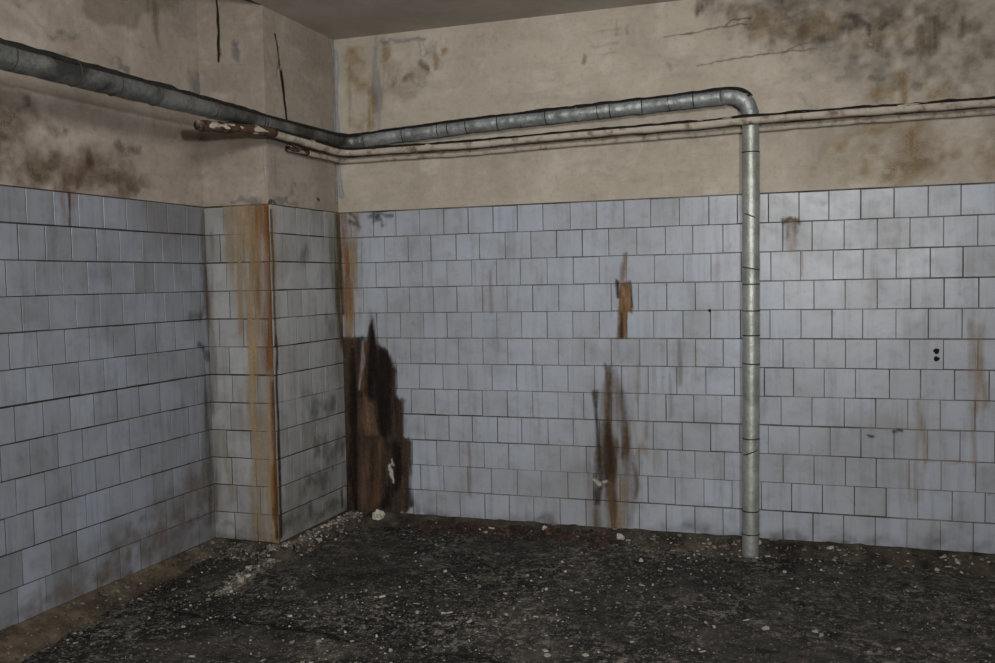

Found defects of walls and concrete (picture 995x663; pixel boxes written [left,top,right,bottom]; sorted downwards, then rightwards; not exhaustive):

crack [214,0,222,63]
crack [274,18,287,120]
rust [335,212,358,345]
rust [229,200,282,543]
spalling [343,322,413,513]
rust [592,366,628,528]